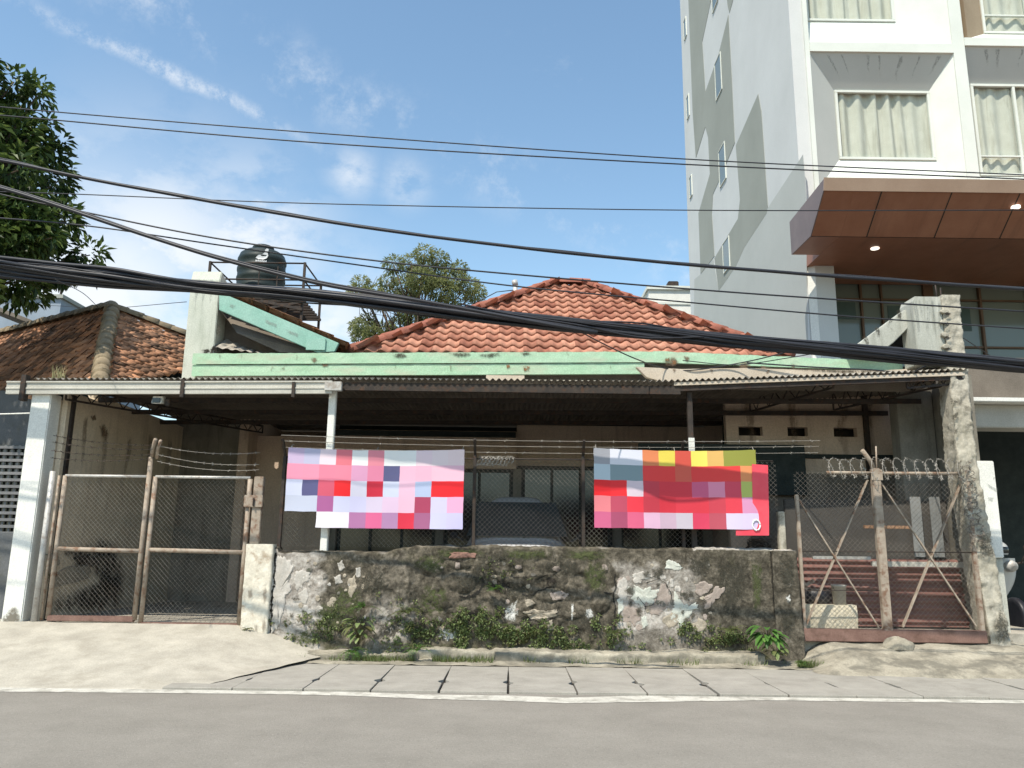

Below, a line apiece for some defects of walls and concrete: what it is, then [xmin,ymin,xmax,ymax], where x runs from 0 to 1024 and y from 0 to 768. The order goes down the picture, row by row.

flaking render [268,555,366,635]
flaking render [429,616,455,641]
flaking render [440,547,569,635]
peeling [589,560,725,634]